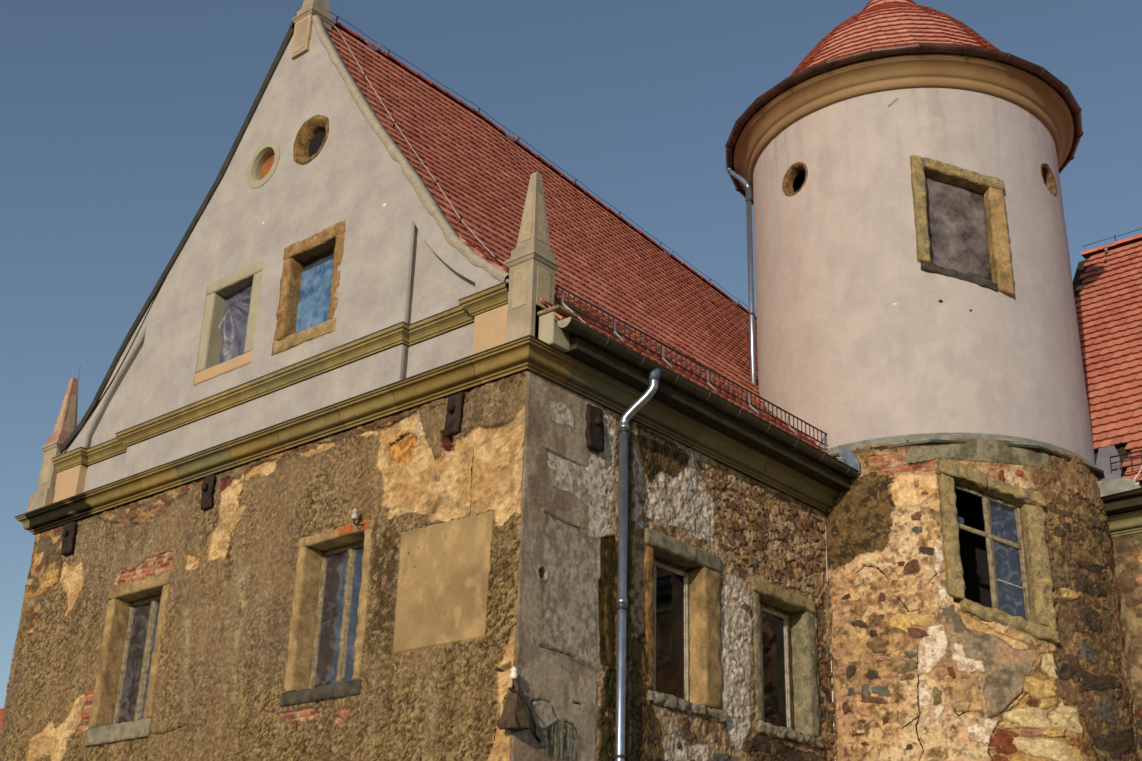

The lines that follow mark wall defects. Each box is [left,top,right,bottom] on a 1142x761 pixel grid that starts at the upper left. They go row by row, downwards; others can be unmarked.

peeling [550,401,574,428]
spalling [96,479,204,523]
peeling [114,397,525,585]
peeling [548,414,618,669]
spalling [24,527,86,636]
crack [855,565,919,612]
peeling [27,689,94,761]